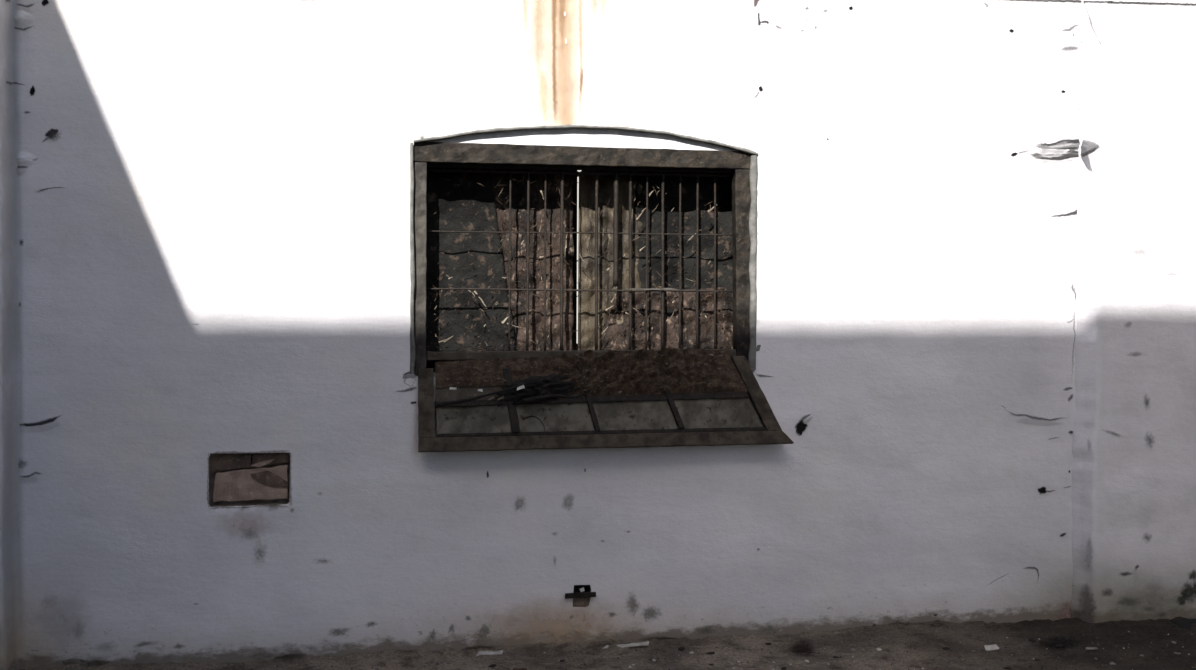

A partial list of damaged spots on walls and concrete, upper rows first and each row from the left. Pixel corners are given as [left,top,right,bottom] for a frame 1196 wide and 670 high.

corrosion [541,0,582,125]